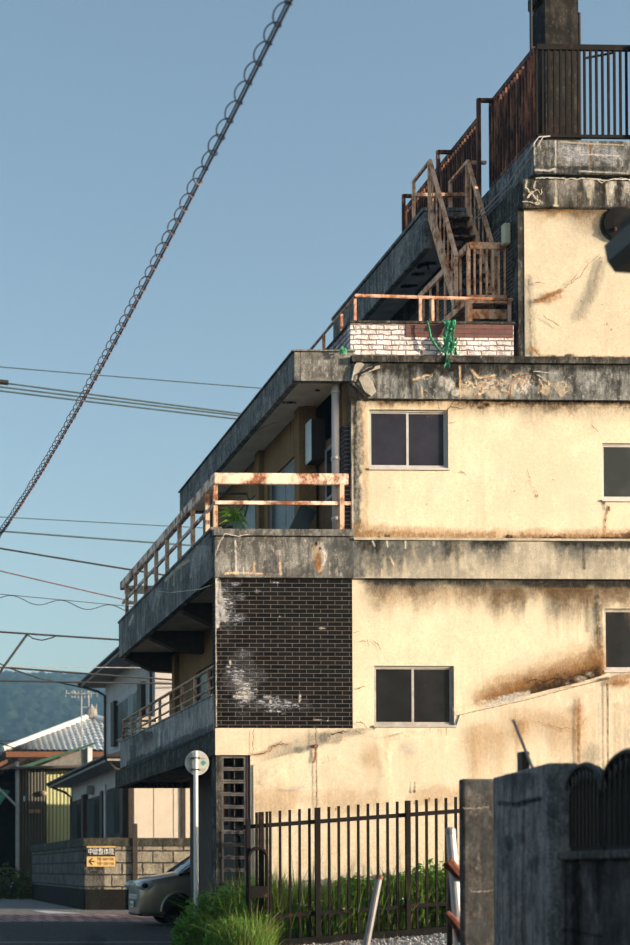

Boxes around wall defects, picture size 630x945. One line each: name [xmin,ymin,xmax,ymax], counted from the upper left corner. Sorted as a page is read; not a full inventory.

crack [531,253,601,326]
spalling [347,362,381,402]
damp [372,343,630,410]
corrosion [505,501,630,539]
corrosion [312,542,327,574]
damp [330,399,630,702]
damp [215,578,241,628]
damp [216,659,301,712]
crack [252,730,288,755]